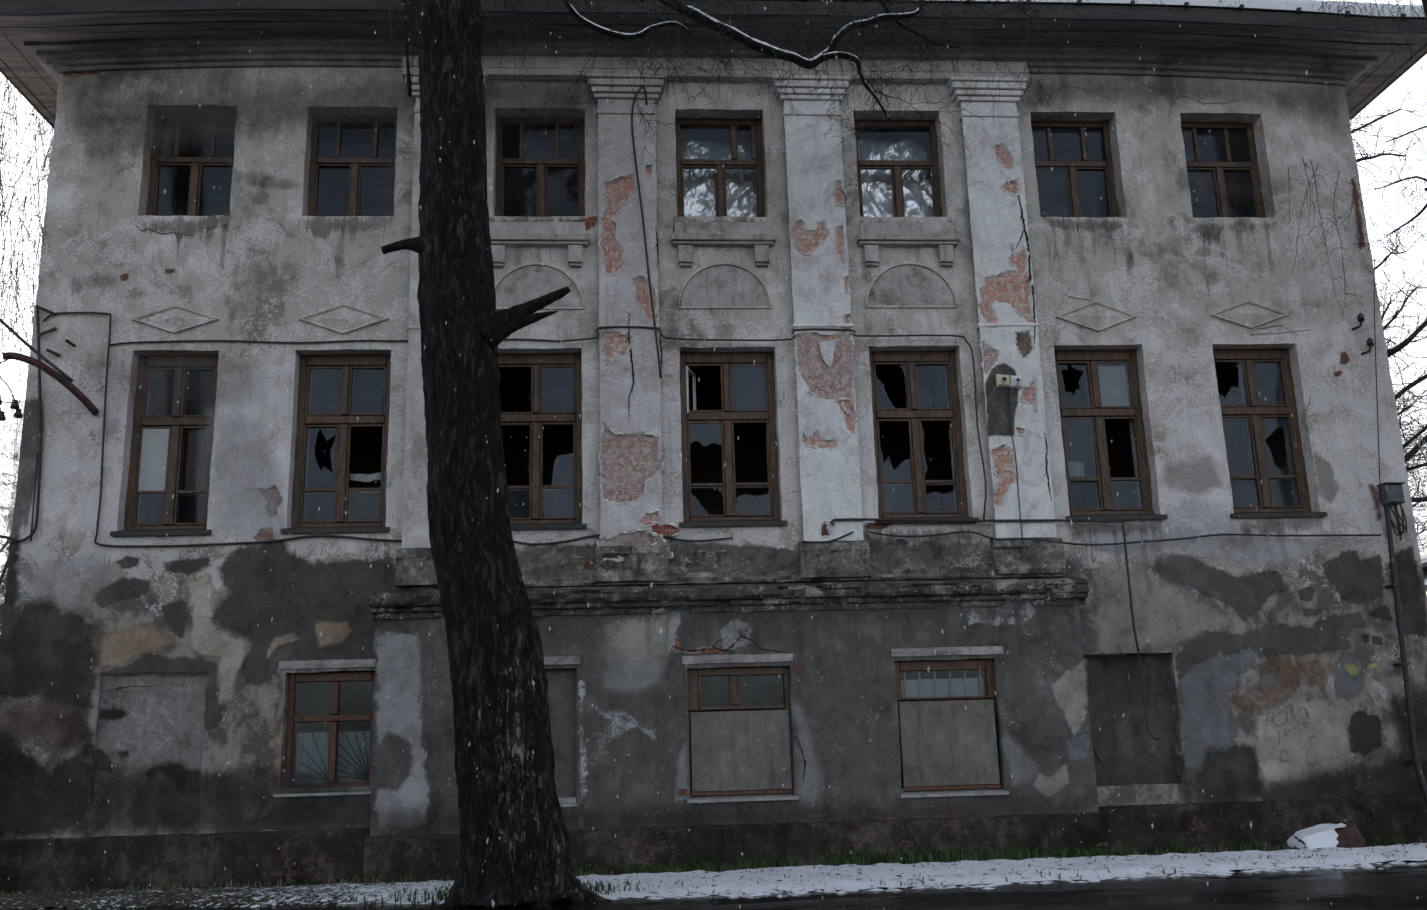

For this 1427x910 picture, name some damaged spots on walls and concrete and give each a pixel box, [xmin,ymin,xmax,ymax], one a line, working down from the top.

flaking render [994,143,1021,196]
flaking render [571,163,658,320]
flaking render [790,218,850,294]
flaking render [979,244,1035,374]
flaking render [795,312,858,434]
flaking render [598,426,664,505]
flaking render [803,431,835,450]
flaking render [991,426,1026,506]
flaking render [253,485,282,541]
flaking render [560,509,680,569]
water stain [5,705,413,830]
water stain [1189,693,1427,804]